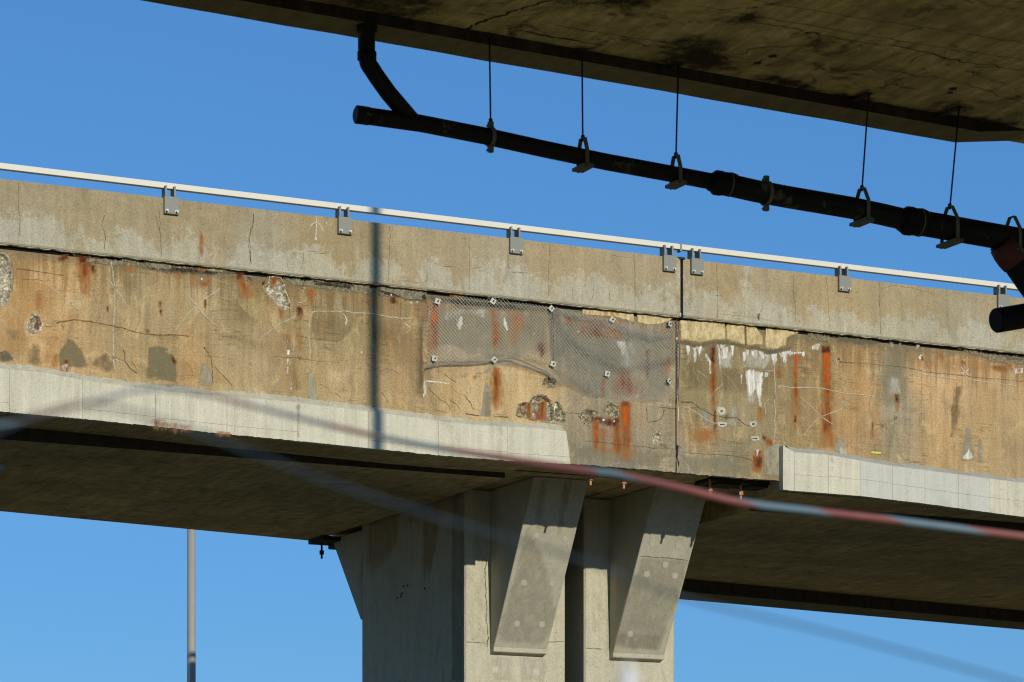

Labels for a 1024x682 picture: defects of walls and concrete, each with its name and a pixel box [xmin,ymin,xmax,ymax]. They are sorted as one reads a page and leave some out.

crack [466,0,1024,104]
spalling [0,252,13,307]
spalling [86,258,220,276]
spalling [244,275,546,312]
spalling [26,314,43,334]
crack [46,319,232,386]
rust [492,368,501,408]
spalling [516,376,567,426]
rust [592,368,637,459]
leakage [677,338,820,407]
rust [821,345,834,447]
rust [752,436,773,472]